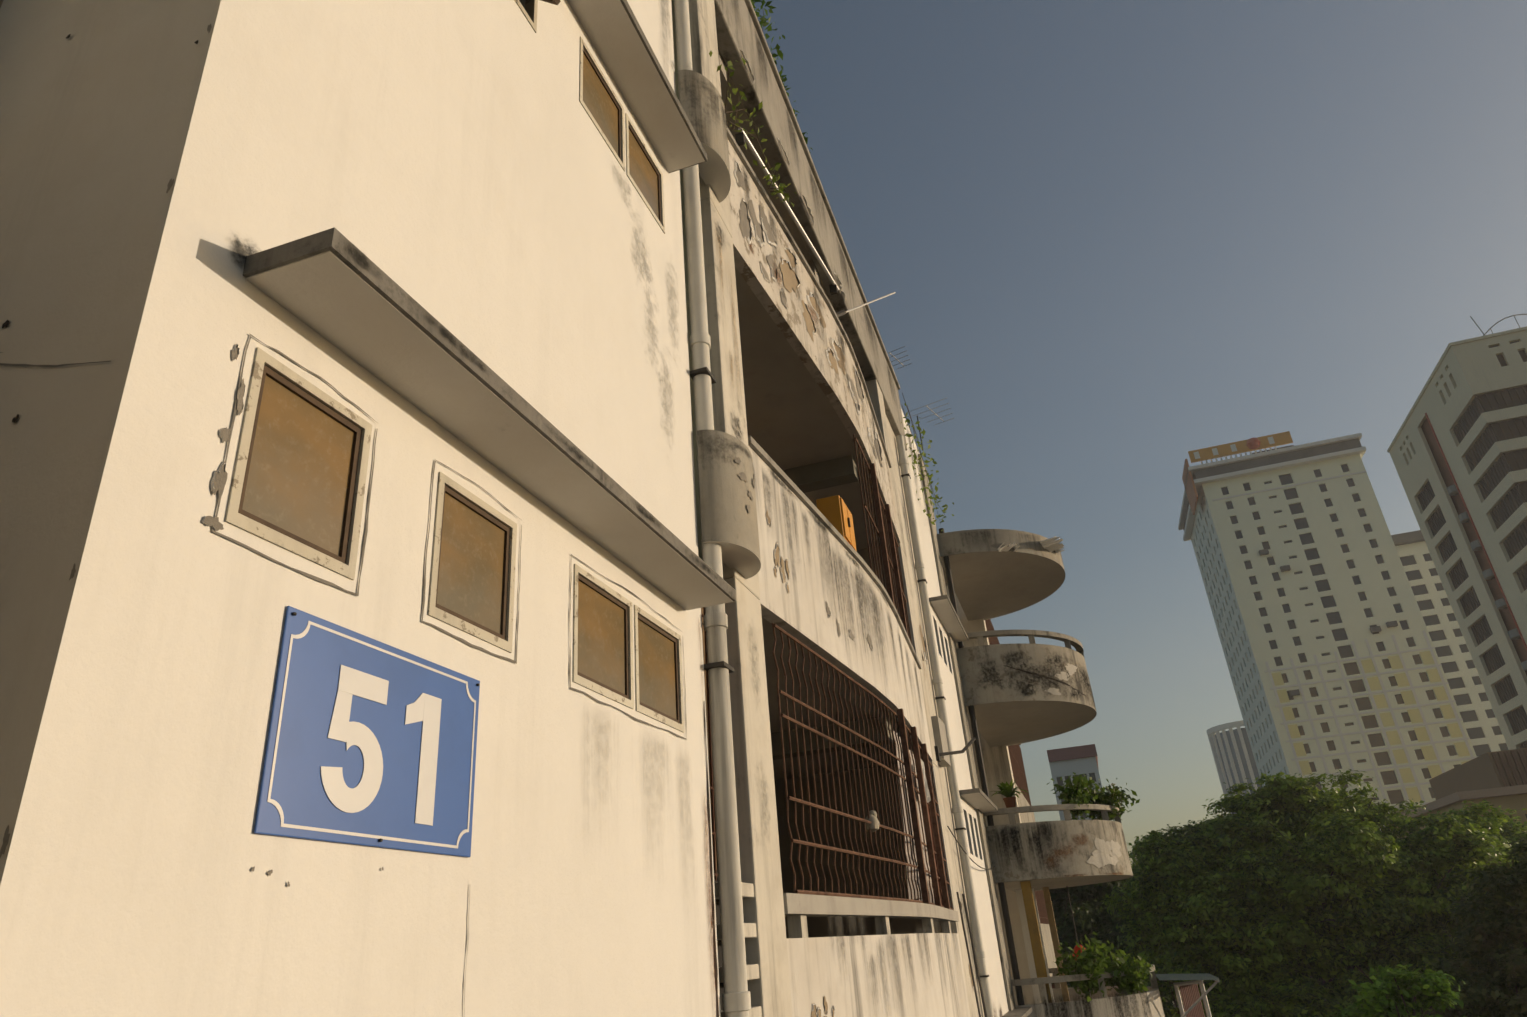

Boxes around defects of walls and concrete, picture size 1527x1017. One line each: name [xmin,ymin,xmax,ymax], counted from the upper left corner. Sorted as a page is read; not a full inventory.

peeling [734,161,883,468]
crack [0,352,111,367]
water stain [754,471,920,694]
mould [980,652,1095,707]
peeling [1087,837,1122,868]
peeling [811,996,835,1017]